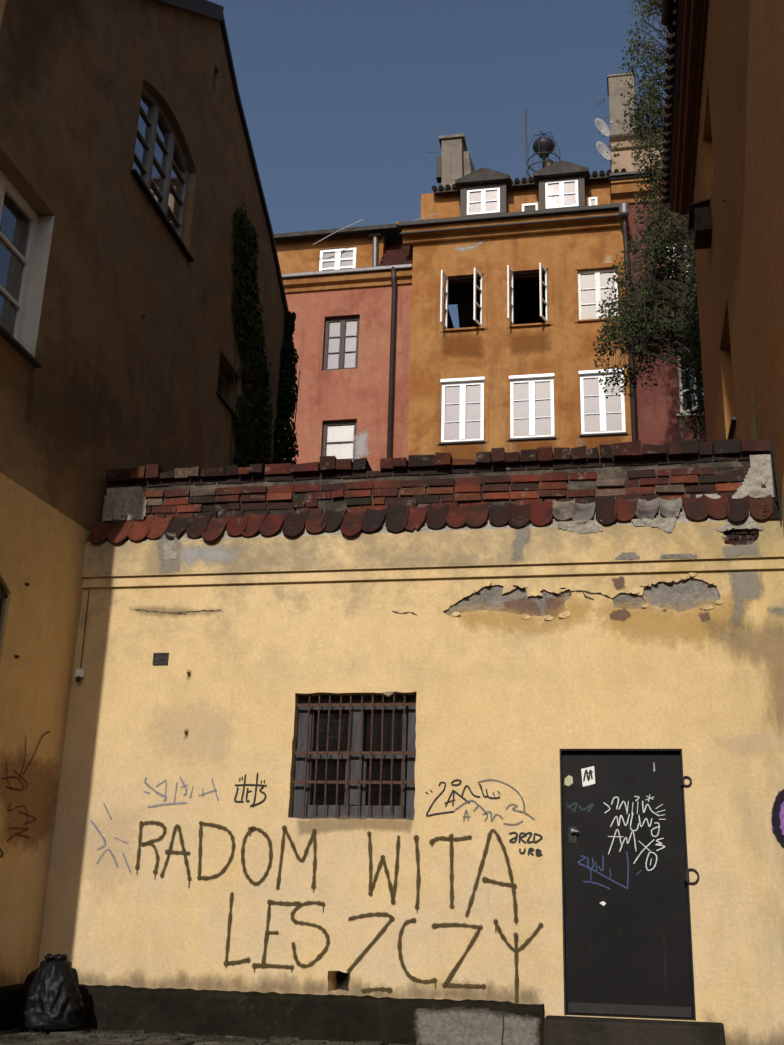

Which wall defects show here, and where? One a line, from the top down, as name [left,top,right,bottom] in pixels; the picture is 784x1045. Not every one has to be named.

peeling [732,454,775,499]
peeling [102,486,147,521]
flaking render [716,516,764,557]
crack [134,608,221,616]
peeling [443,580,587,629]
damp [729,570,763,625]